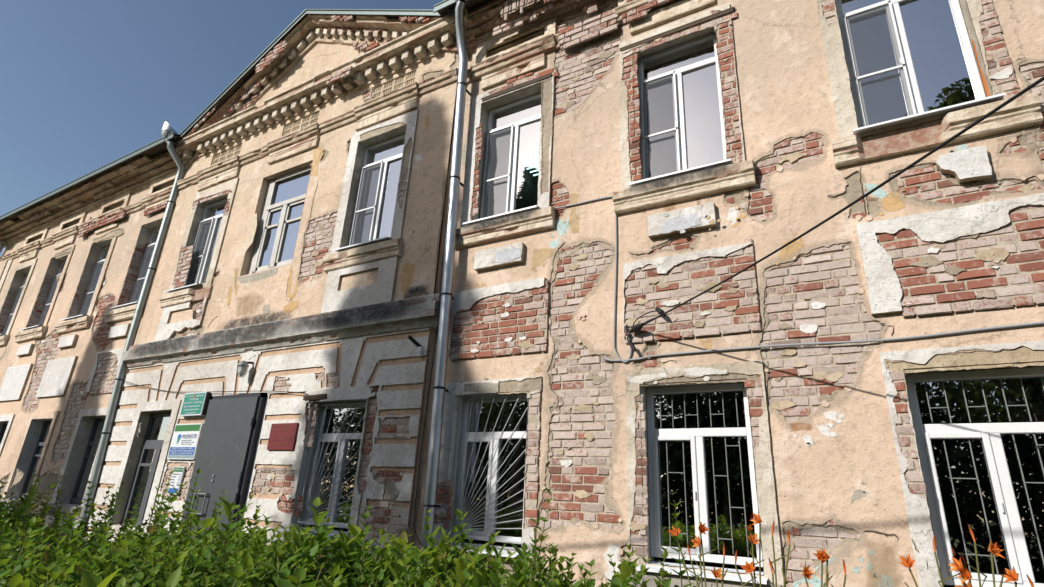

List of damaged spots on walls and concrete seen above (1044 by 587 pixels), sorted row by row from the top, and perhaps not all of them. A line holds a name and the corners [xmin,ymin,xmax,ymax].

flaking render [556,0,618,33]
flaking render [832,0,1044,317]
flaking render [227,210,338,315]
flaking render [450,11,894,587]
flaking render [21,329,61,413]
flaking render [51,275,118,464]
spalling [884,346,1044,507]
spalling [0,470,24,496]
flaking render [276,495,304,516]